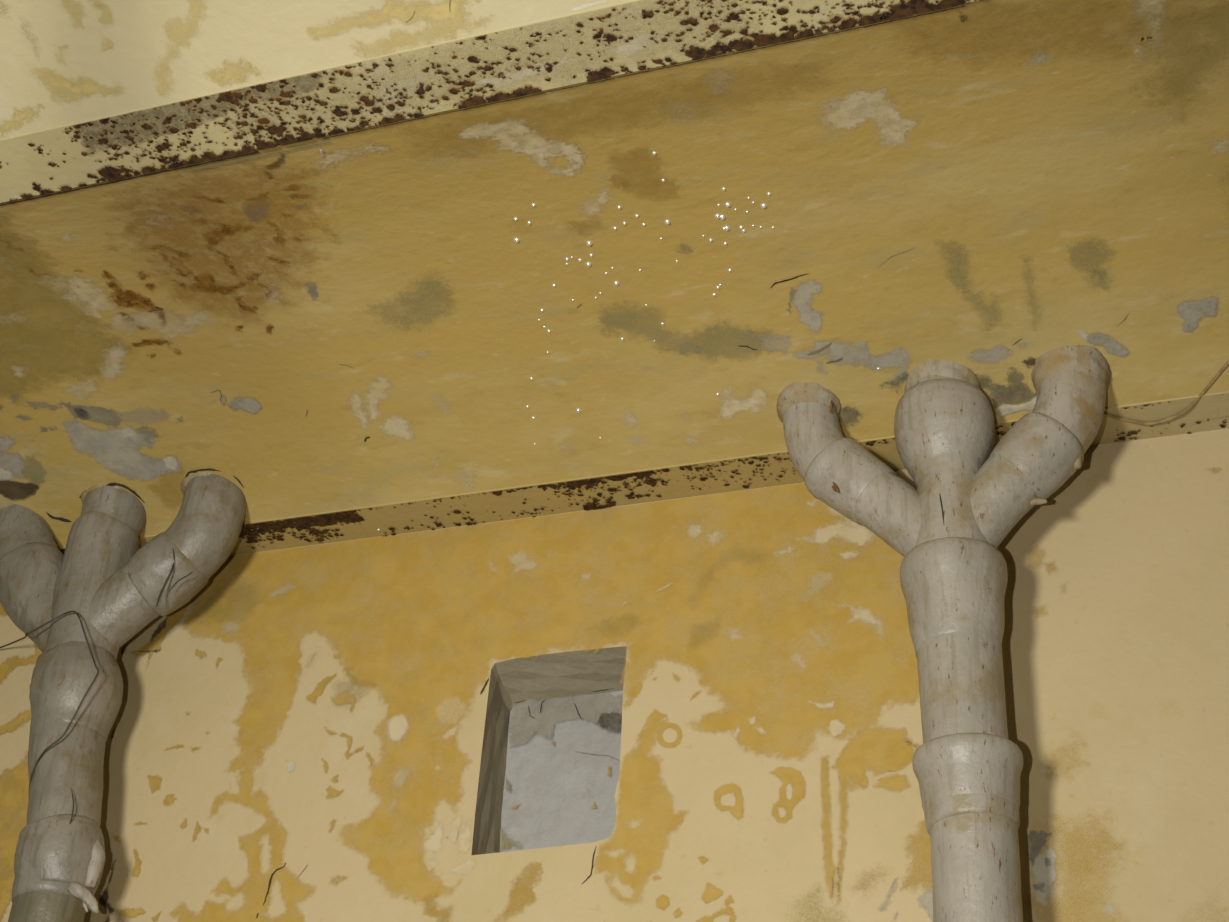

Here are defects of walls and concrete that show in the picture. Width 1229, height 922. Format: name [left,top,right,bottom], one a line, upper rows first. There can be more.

rust [9,0,983,201]
peeling [0,255,221,408]
rust [101,270,180,359]
rust [1112,419,1227,442]
flaking render [0,467,39,501]
rust [239,453,798,549]
peeling [773,517,876,563]
peeling [307,666,376,714]
flaking render [508,677,657,747]
peeling [807,701,921,793]
peeling [98,765,317,922]
peeling [593,708,689,922]